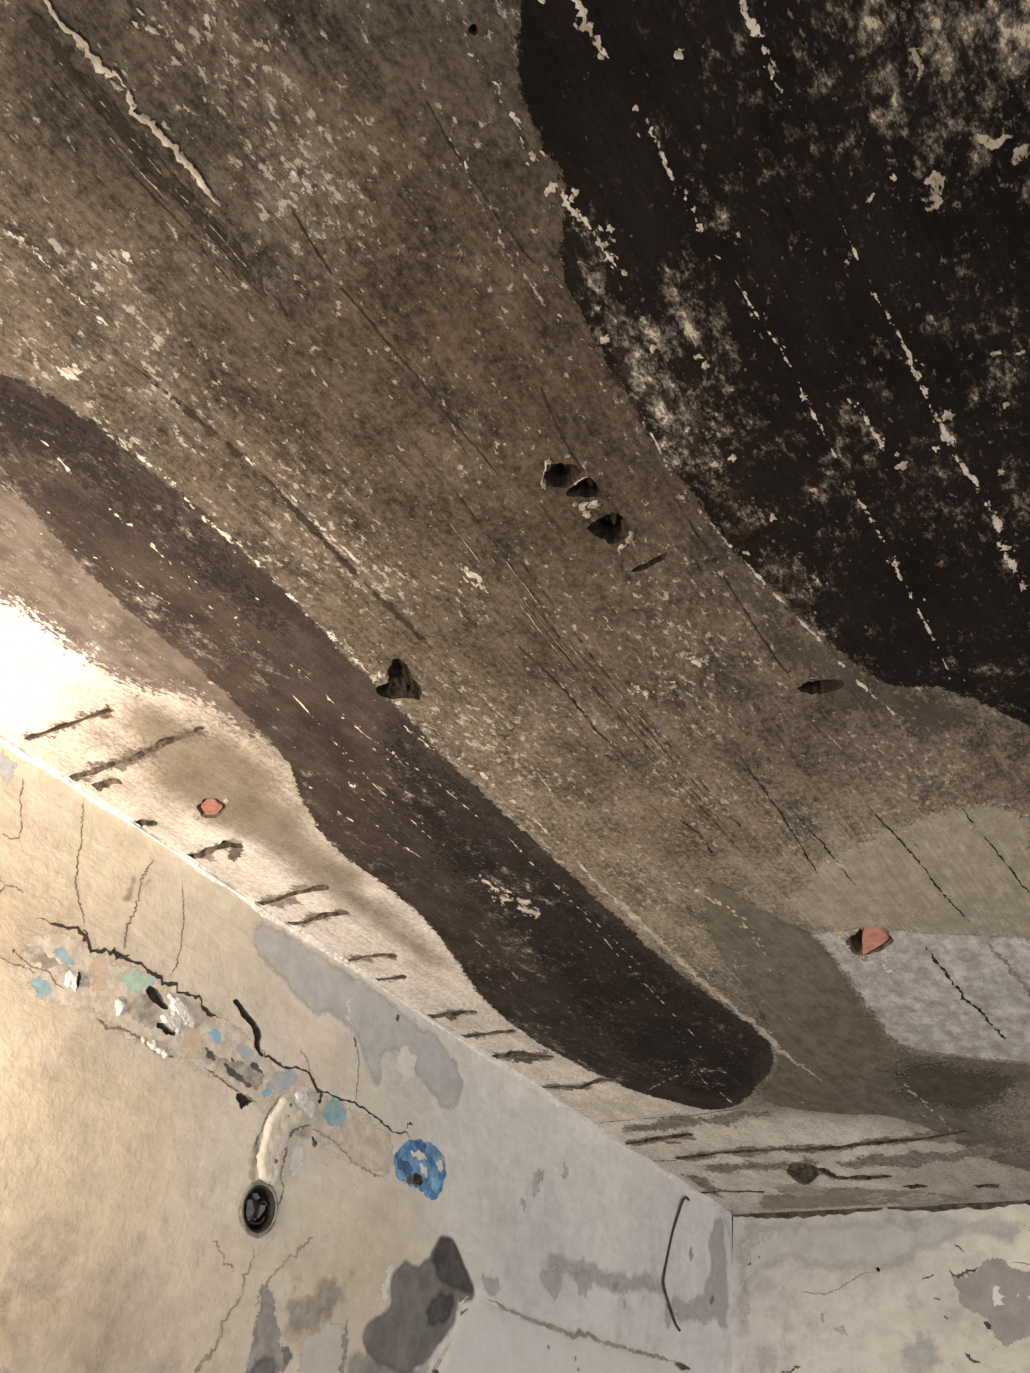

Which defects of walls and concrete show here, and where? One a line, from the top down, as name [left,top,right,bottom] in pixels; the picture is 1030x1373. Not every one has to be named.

water stain [0,481,385,918]
spalling [361,658,422,706]
crack [2,780,24,840]
spalling [146,986,175,1036]
crack [0,800,413,1138]
flaking render [254,883,463,1109]
water stain [508,838,676,1017]
spalling [236,1093,253,1110]
water stain [246,1237,474,1373]
flaking render [952,1257,1030,1347]